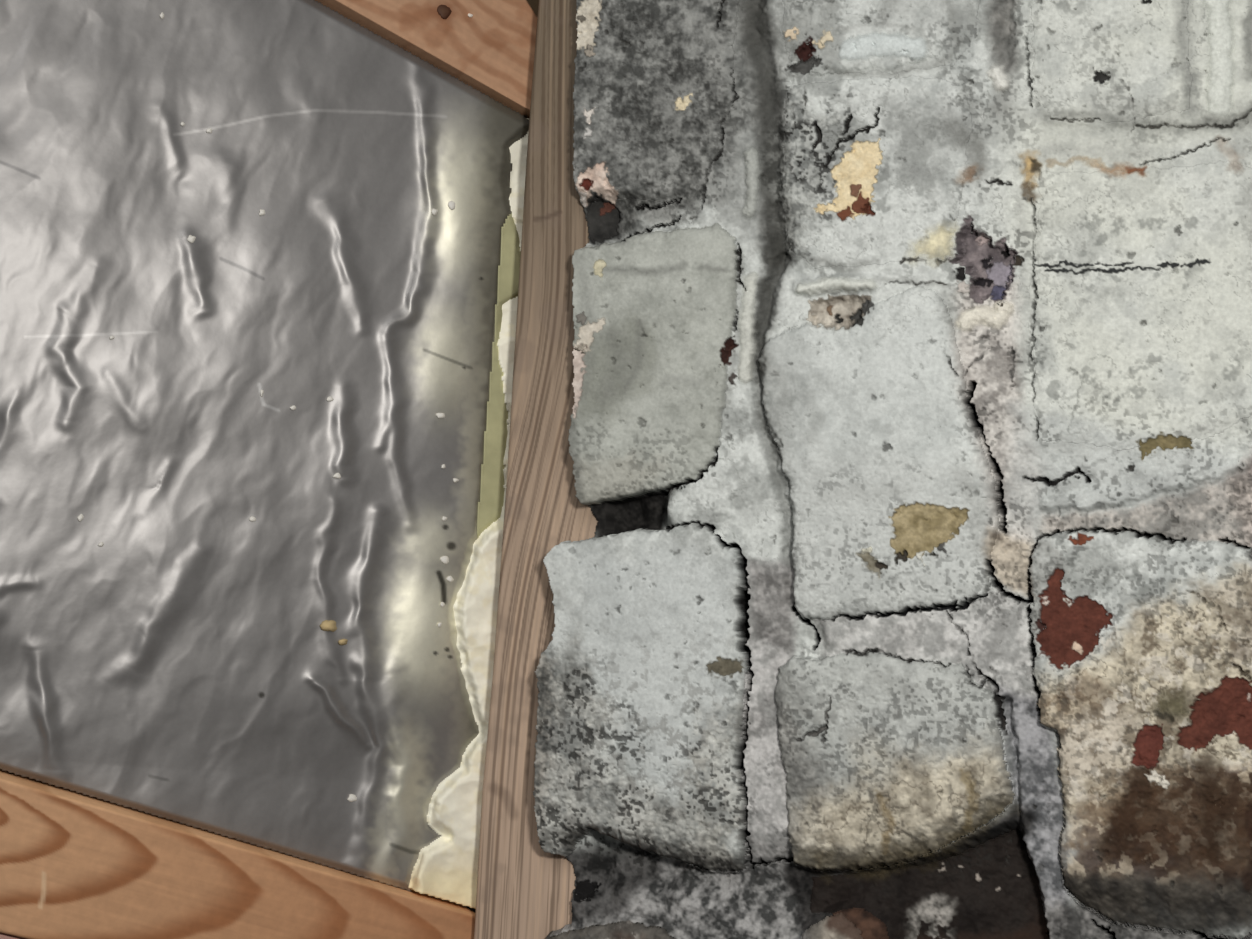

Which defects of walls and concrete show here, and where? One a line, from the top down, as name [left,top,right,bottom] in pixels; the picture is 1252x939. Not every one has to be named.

crack [804,95,880,168]
peeling [814,138,883,221]
spalling [949,216,1025,304]
spalling [807,294,874,330]
crack [949,179,1091,533]
crack [664,448,718,496]
peeling [1126,432,1193,471]
peeling [857,502,969,578]
crack [1037,527,1186,545]
crack [666,521,754,698]
crack [793,560,1041,735]
leakage [1101,762,1252,887]